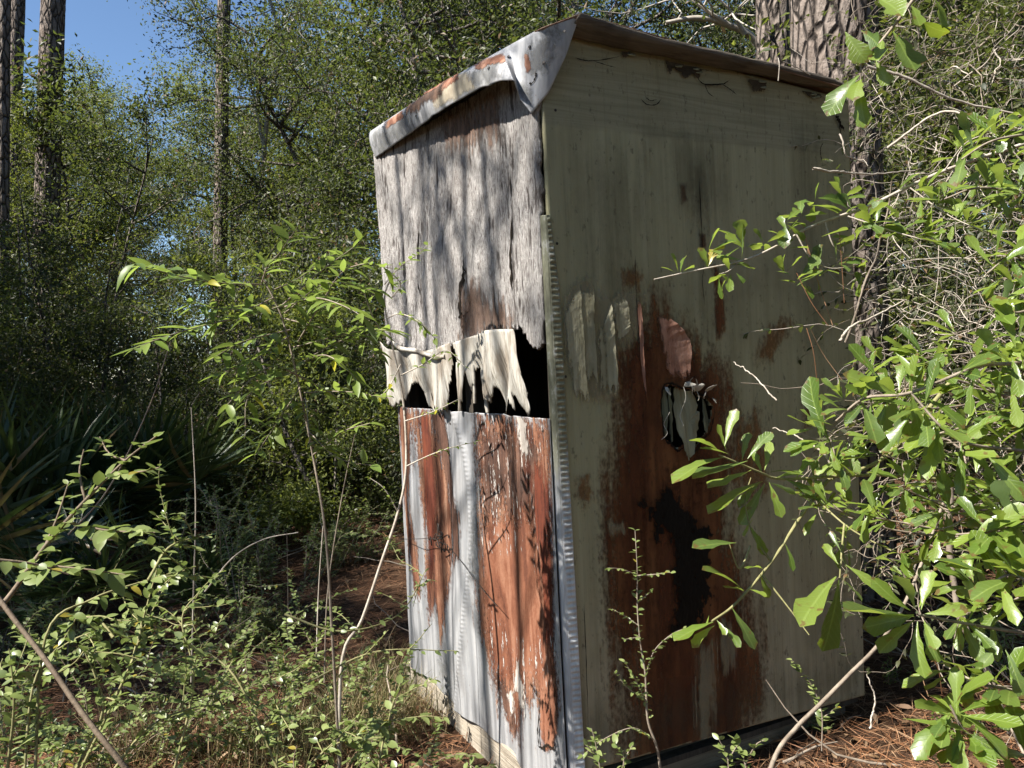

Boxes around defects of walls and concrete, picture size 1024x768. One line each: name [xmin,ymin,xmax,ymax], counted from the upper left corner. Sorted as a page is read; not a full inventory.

corrosion [385,53,507,128]
peeling [684,381,717,404]
corrosion [713,265,725,338]
corrosion [398,406,461,649]
corrosion [472,413,562,751]
corrosion [575,294,769,759]